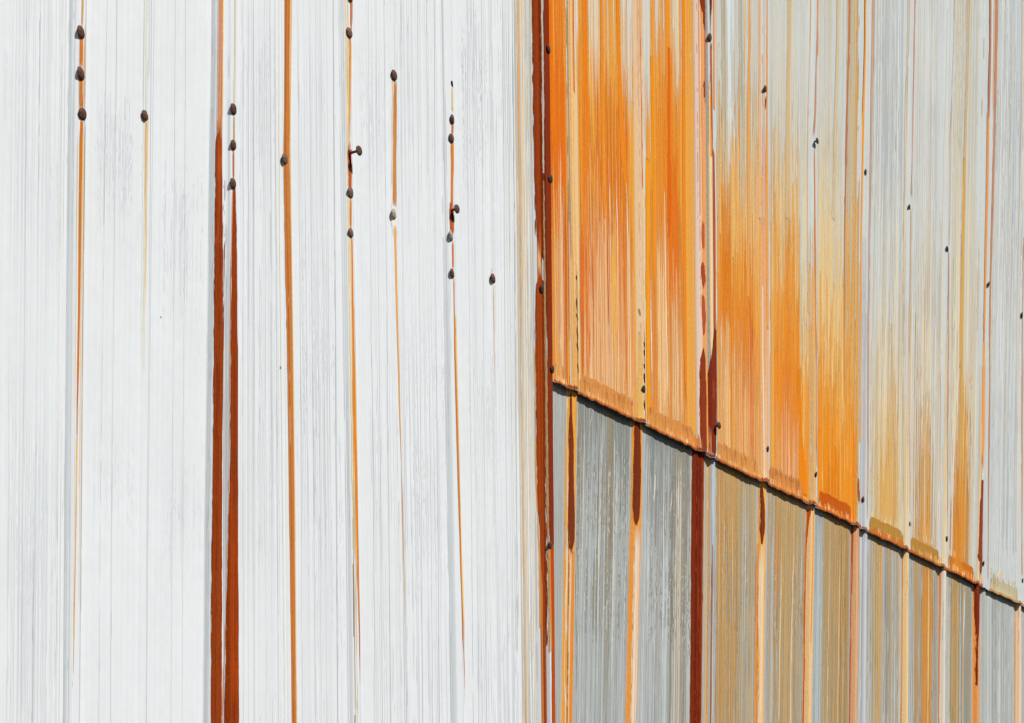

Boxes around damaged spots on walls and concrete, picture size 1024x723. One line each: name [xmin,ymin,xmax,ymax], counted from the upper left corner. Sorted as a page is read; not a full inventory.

corrosion [73,0,86,653]
corrosion [211,0,239,723]
corrosion [279,0,297,723]
corrosion [345,2,361,683]
corrosion [453,281,465,683]
corrosion [506,0,1024,723]